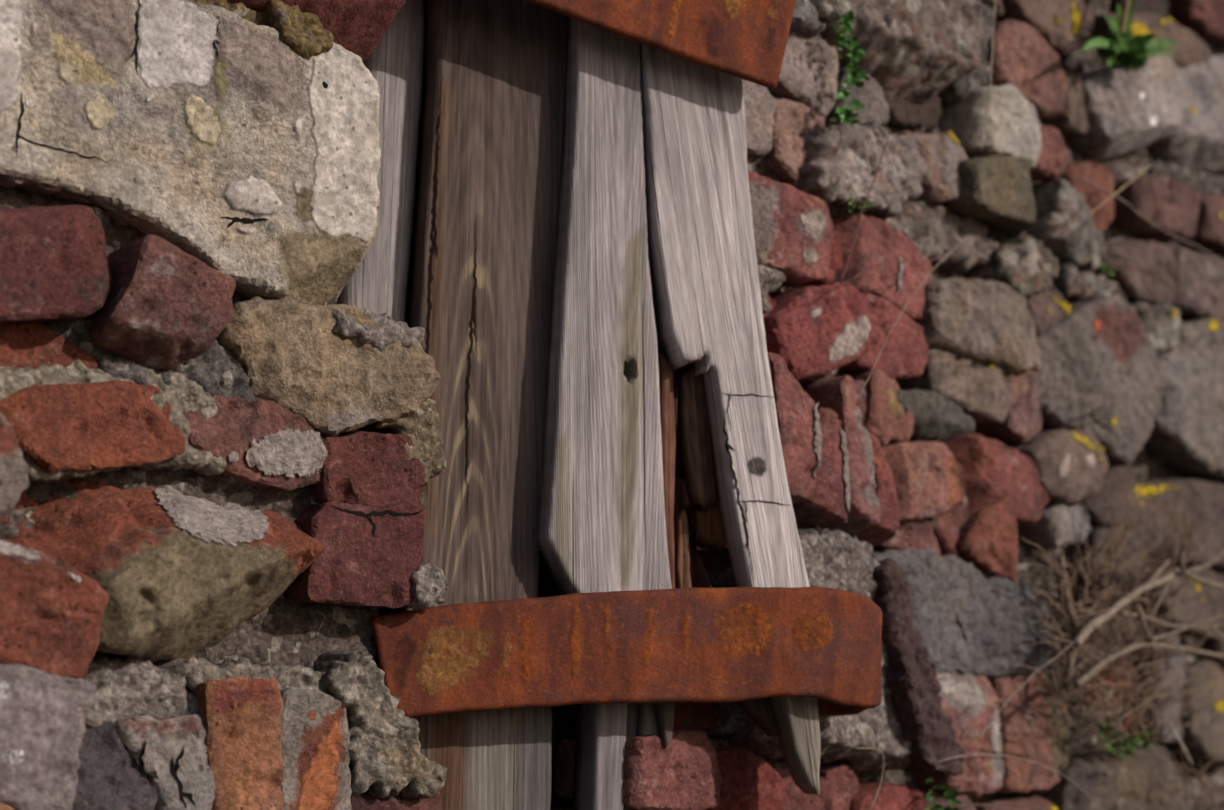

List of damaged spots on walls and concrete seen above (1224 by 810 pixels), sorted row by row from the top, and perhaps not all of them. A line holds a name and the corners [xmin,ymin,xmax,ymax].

crack [129,0,142,73]
crack [16,91,109,162]
crack [425,67,443,355]
crack [466,220,477,515]
crack [334,482,428,535]
crack [138,740,196,809]